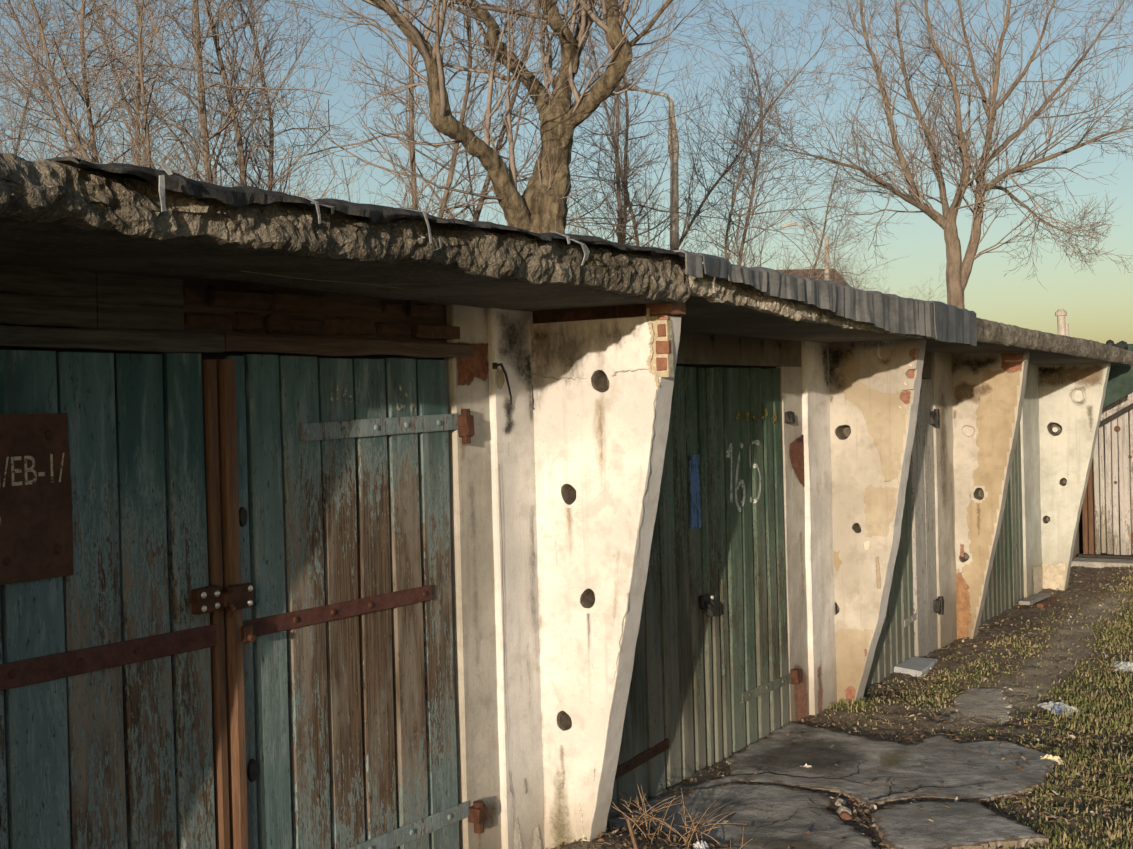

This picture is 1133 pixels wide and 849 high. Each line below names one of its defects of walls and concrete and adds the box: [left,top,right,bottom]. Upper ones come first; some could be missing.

flaking render [457,342,505,389]
damp [504,400,513,433]
flaking render [789,435,805,487]
flaking render [836,348,916,588]
flaking render [956,352,1027,640]
crack [733,764,985,806]